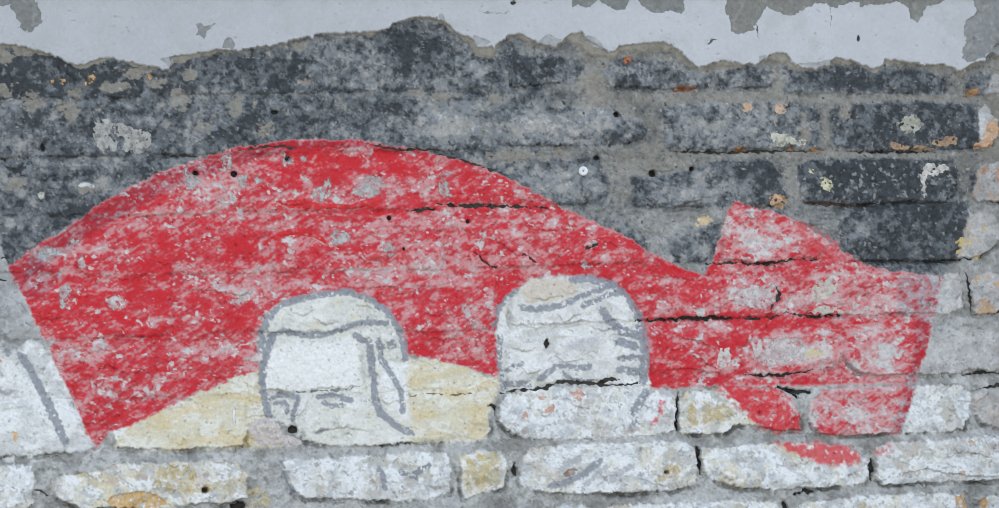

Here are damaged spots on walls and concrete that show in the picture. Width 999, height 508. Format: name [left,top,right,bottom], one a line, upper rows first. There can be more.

peeling [0,0,42,32]
peeling [195,23,216,38]
peeling [538,34,562,48]
peeling [725,0,945,34]
peeling [962,0,999,62]
peeling [799,59,831,69]